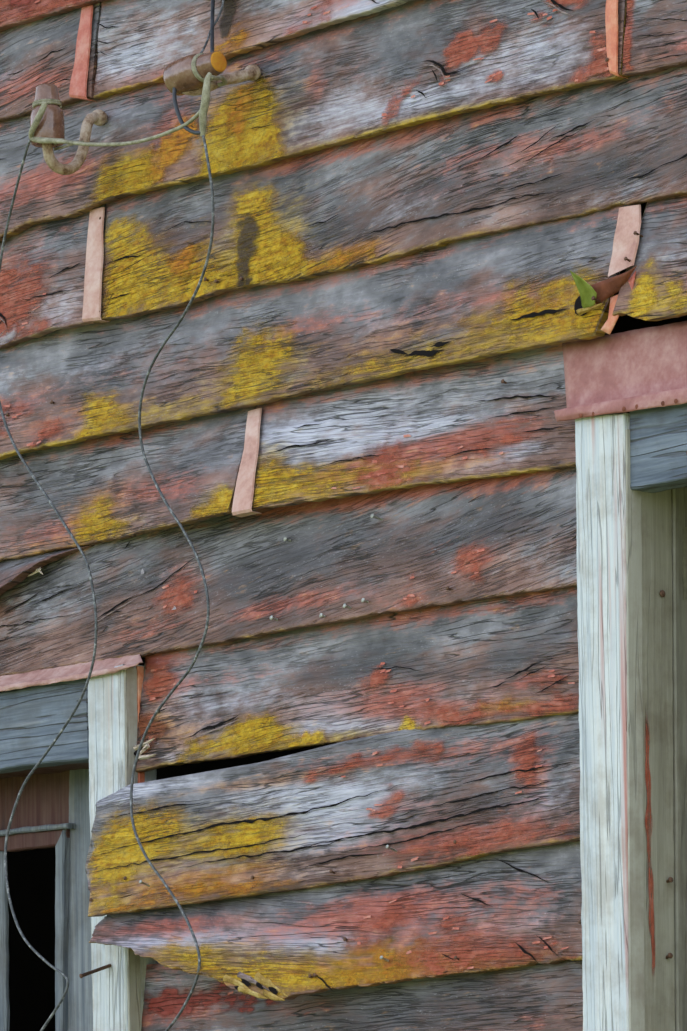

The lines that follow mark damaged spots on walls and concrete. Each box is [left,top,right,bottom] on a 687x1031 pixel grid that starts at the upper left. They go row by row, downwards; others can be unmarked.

crack [346,119,595,244]
crack [628,154,687,179]
peeling [352,434,412,490]
crack [91,764,570,873]
crack [497,859,549,883]
crack [515,935,559,963]